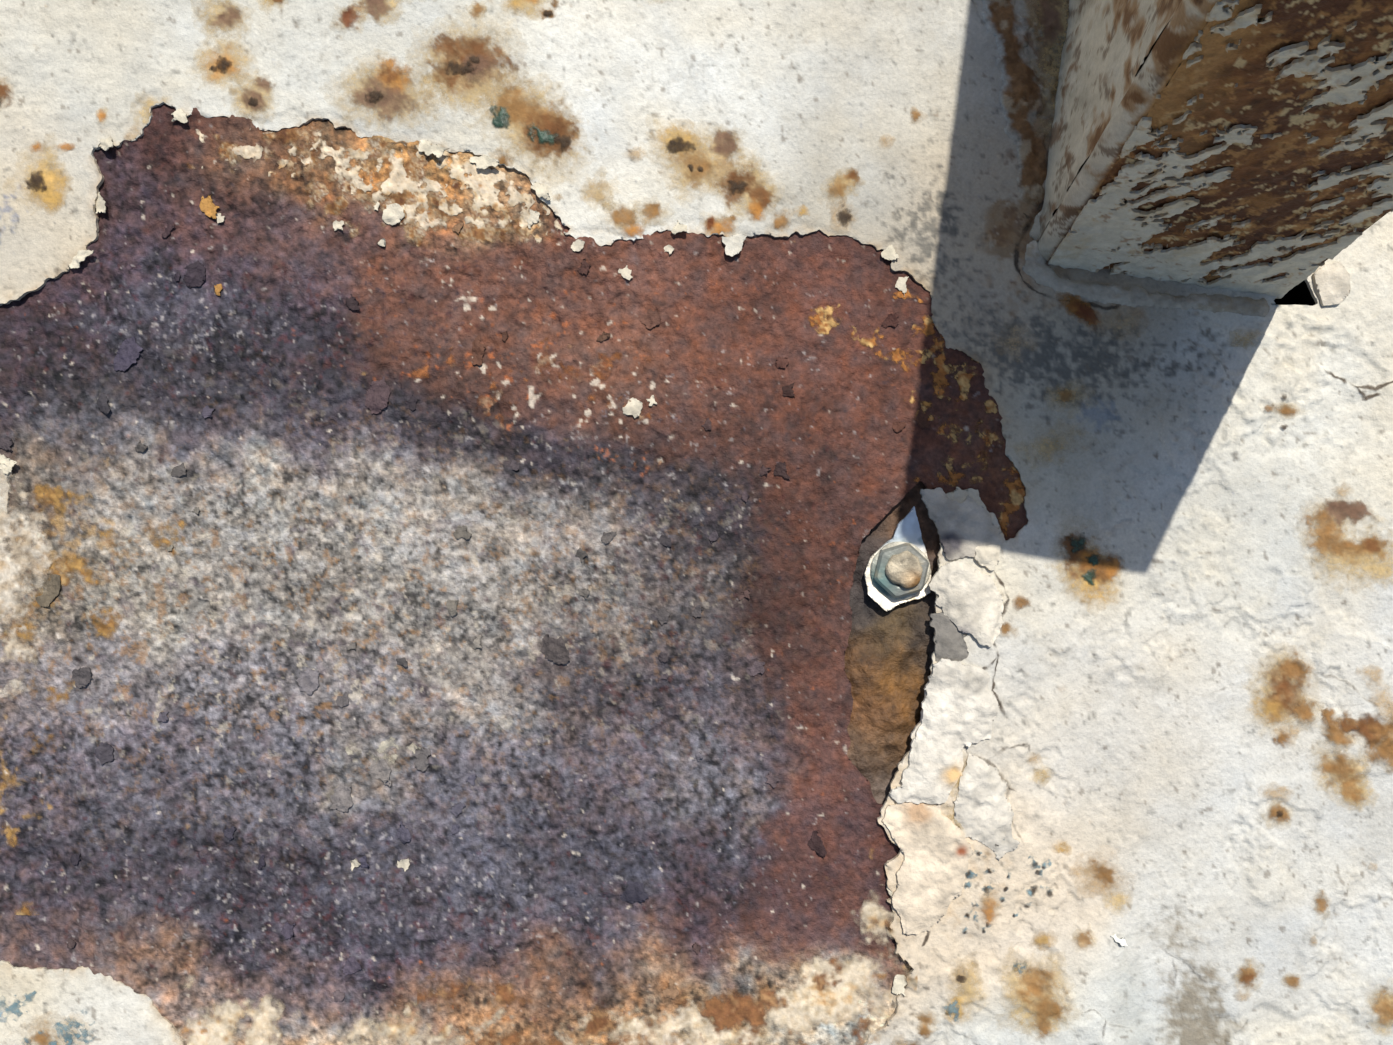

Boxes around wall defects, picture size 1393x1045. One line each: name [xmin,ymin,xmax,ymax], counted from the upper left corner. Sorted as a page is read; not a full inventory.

rust [200,0,271,117]
rust [339,0,397,29]
rust [346,3,579,169]
rust [26,143,74,210]
rust [585,183,665,236]
rust [659,127,806,236]
rust [827,169,860,225]
peeling [0,103,1028,1045]
rust [1060,533,1121,601]
rust [1306,490,1393,578]
rust [1254,652,1393,806]
rust [897,963,979,1045]